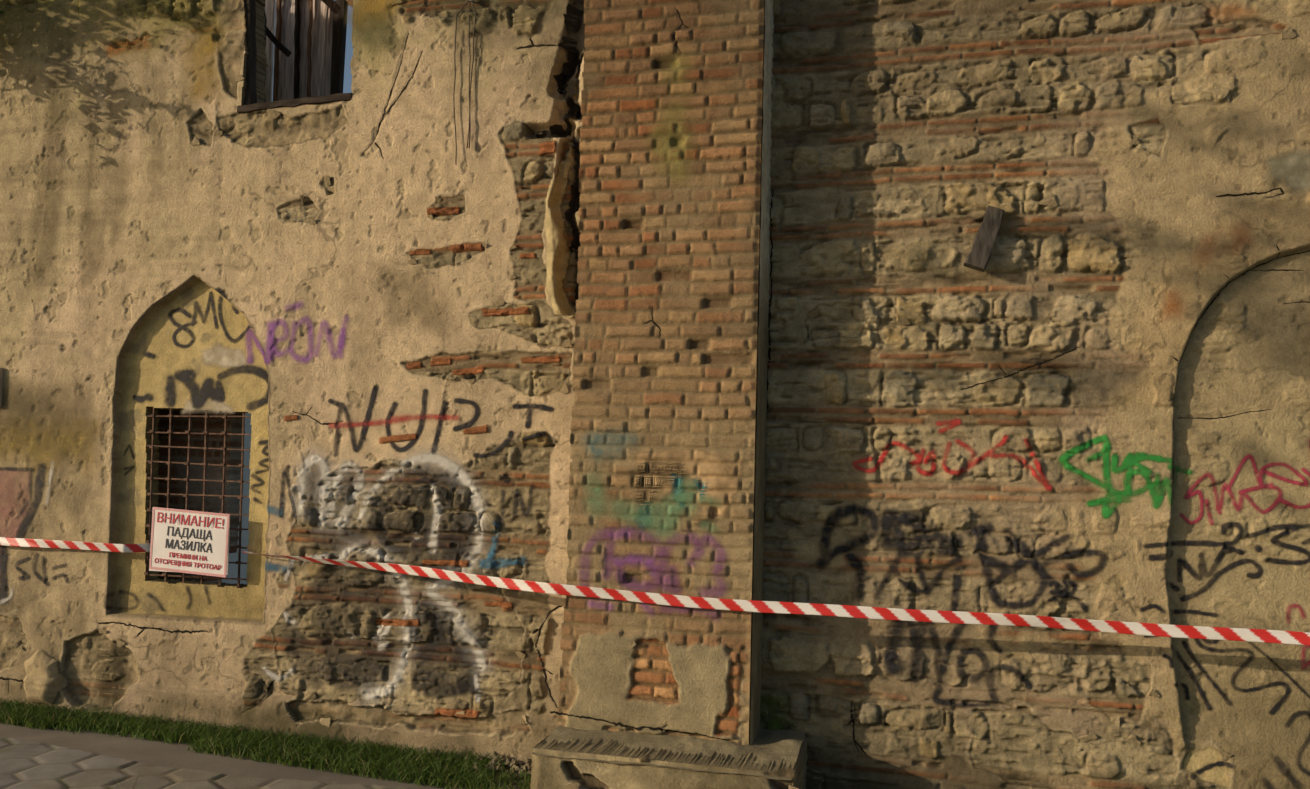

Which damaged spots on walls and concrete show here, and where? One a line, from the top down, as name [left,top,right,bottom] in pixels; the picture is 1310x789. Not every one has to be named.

spalling [215,0,246,98]
spalling [188,108,347,147]
spalling [278,195,319,224]
crack [516,0,585,313]
crack [1216,187,1284,198]
spalling [405,121,583,396]
spalling [271,459,530,733]
spalling [0,615,27,669]
spalling [64,629,139,709]
crack [532,606,735,743]
spalling [629,639,678,704]
spalling [565,762,607,789]